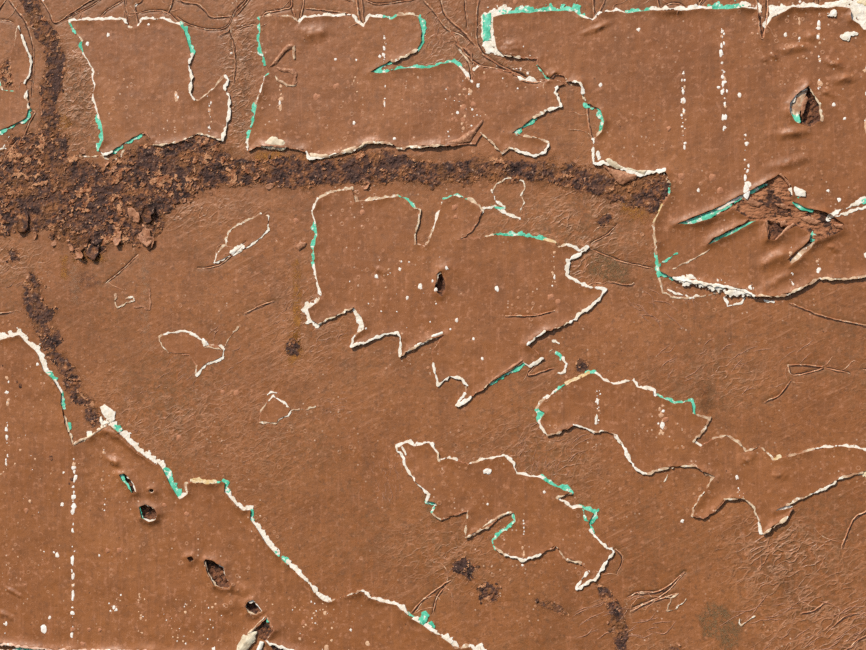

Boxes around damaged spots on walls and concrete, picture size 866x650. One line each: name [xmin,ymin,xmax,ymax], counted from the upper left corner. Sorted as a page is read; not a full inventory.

peeling [68,16,231,160]
crack [0,0,547,166]
rust [0,0,671,280]
peeling [245,0,866,307]
rust [22,271,101,428]
peeling [296,177,866,534]
crack [764,356,866,404]
peeling [0,326,487,650]
crack [410,562,459,614]
peeling [395,439,615,590]
rust [597,583,629,650]
crack [627,571,685,613]